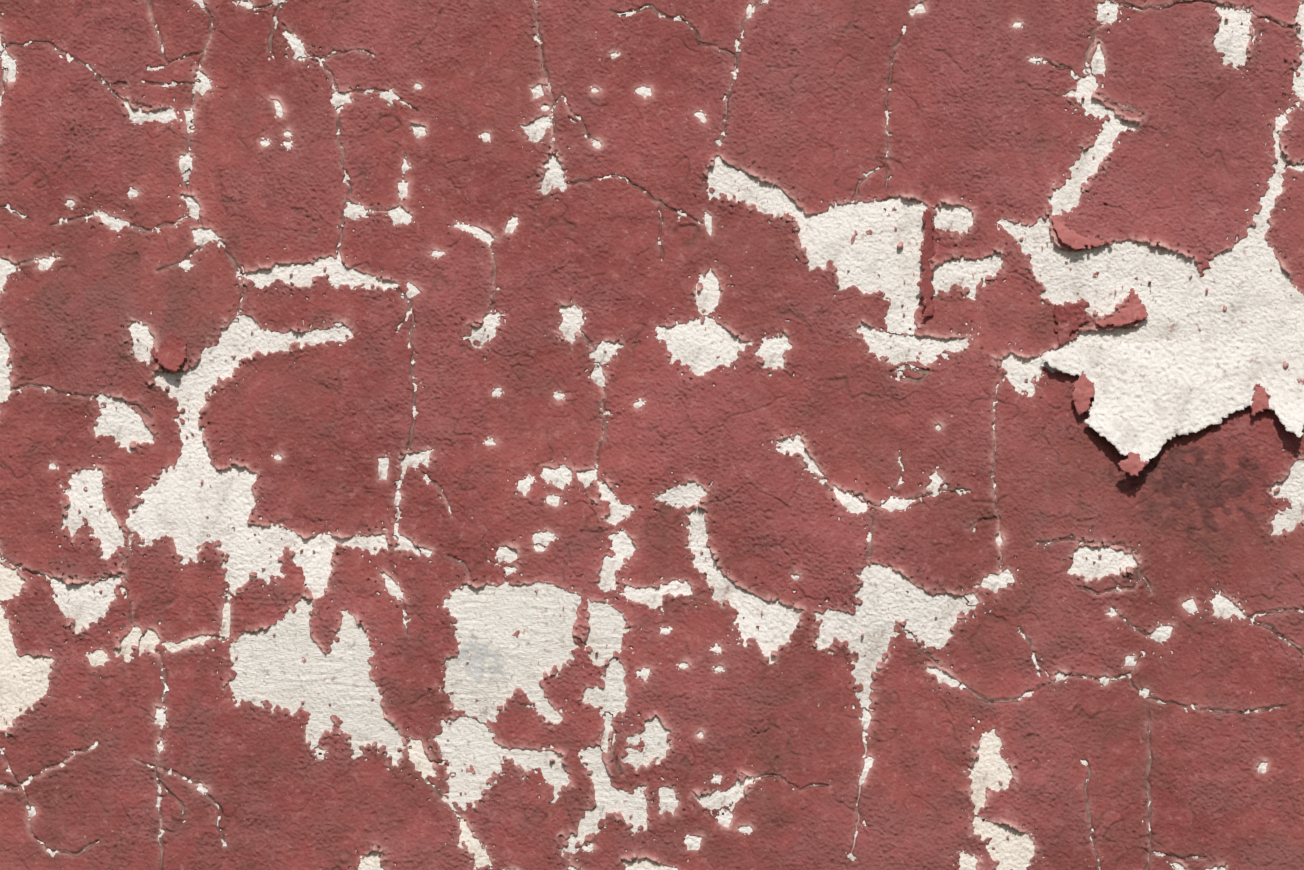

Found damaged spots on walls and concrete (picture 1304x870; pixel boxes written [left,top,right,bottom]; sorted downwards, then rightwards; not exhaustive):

crack [1028,0,1301,117]
peeling [0,246,17,293]
peeling [236,248,404,300]
crack [0,0,700,360]
crack [368,282,475,635]
crack [544,292,634,481]
peeling [647,260,794,386]
peeling [700,0,1304,545]
peeling [0,306,1022,870]
crack [136,651,227,870]
peeling [953,717,1045,870]
crack [901,537,1304,870]